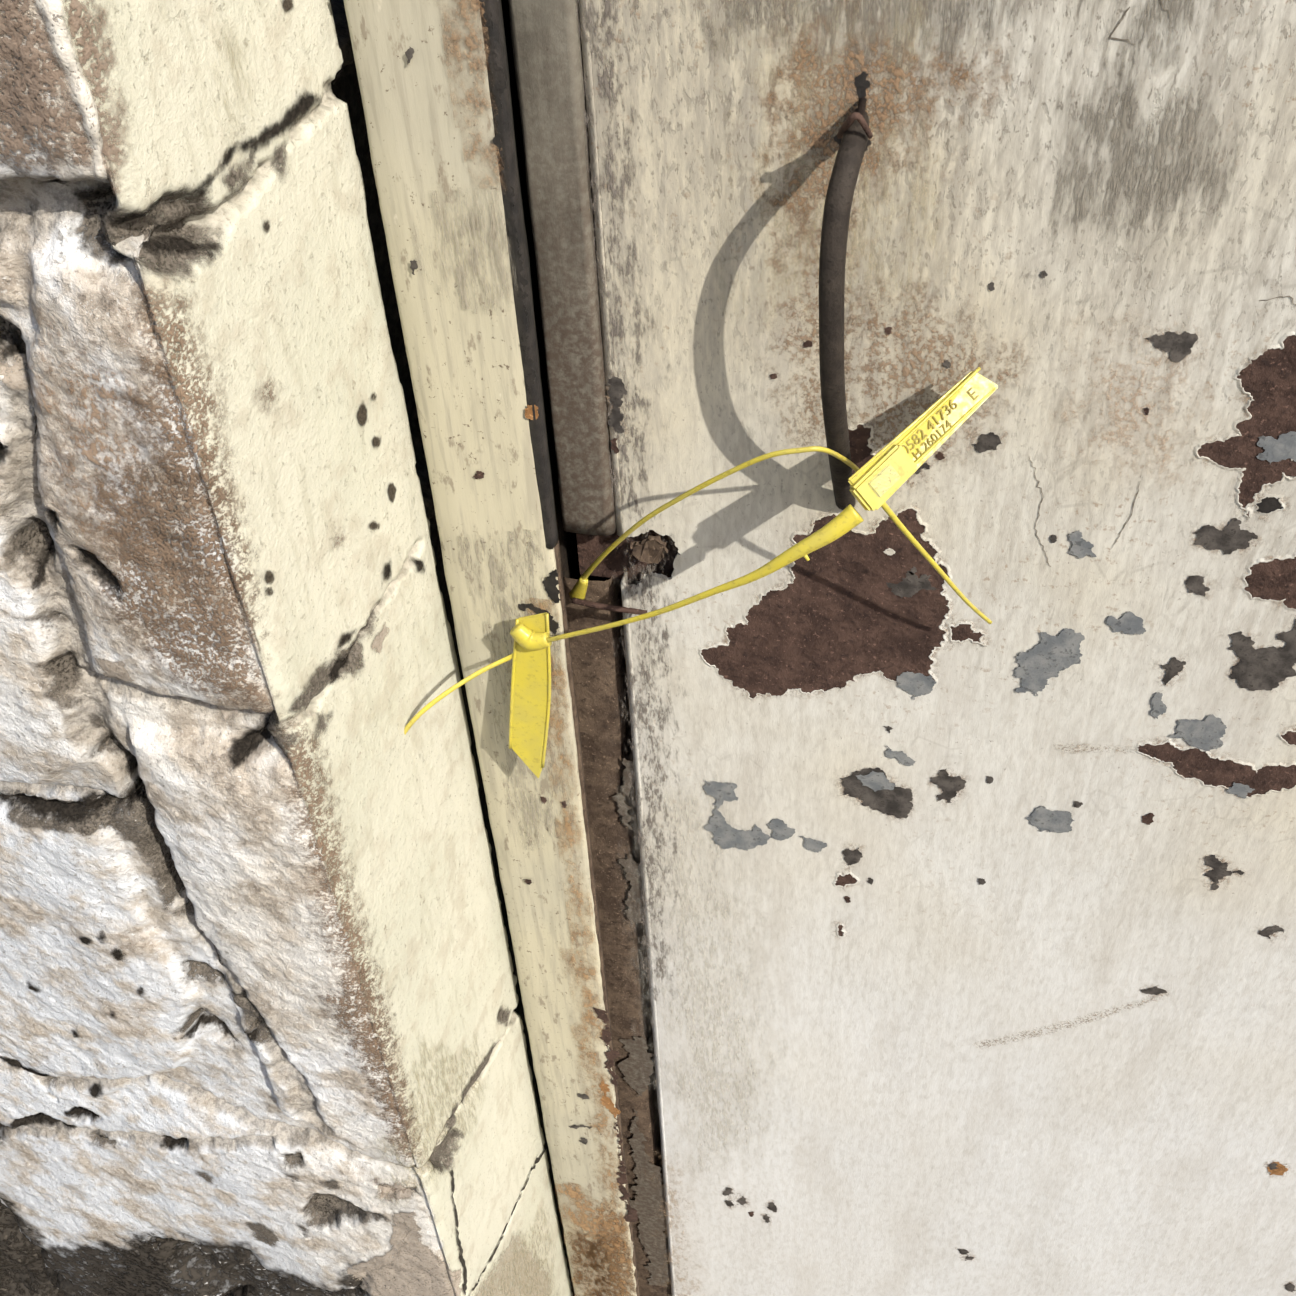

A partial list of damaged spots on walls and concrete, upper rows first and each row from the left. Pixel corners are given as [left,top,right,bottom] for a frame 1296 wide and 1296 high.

crack [184,71,341,196]
rust [443,0,504,182]
crack [1029,457,1051,567]
crack [1111,483,1140,549]
peeling [1193,330,1296,691]
peeling [1186,575,1210,597]
peeling [703,780,827,853]
peeling [1142,813,1155,825]
peeling [832,848,874,903]
rust [567,931,612,1132]
peeling [1141,986,1167,995]
rust [558,1184,632,1296]